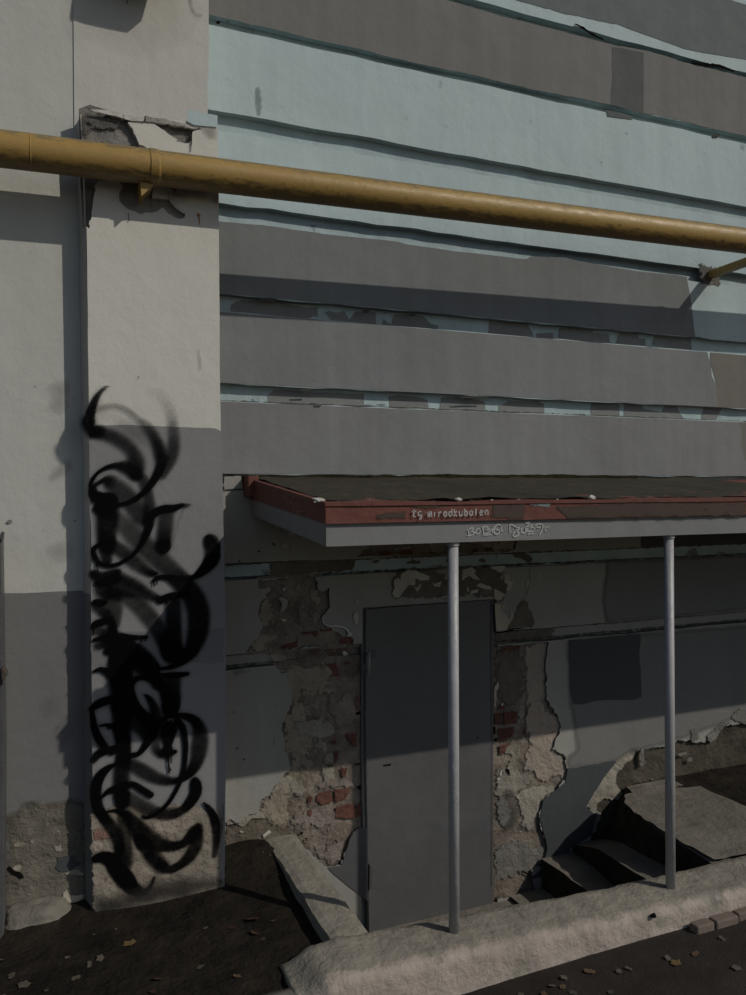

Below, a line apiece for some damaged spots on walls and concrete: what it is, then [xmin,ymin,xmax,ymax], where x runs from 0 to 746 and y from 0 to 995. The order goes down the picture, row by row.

flaking render [79,105,199,147]
flaking render [80,177,104,228]
flaking render [119,182,185,219]
flaking render [6,541,567,912]
flaking render [586,709,746,840]